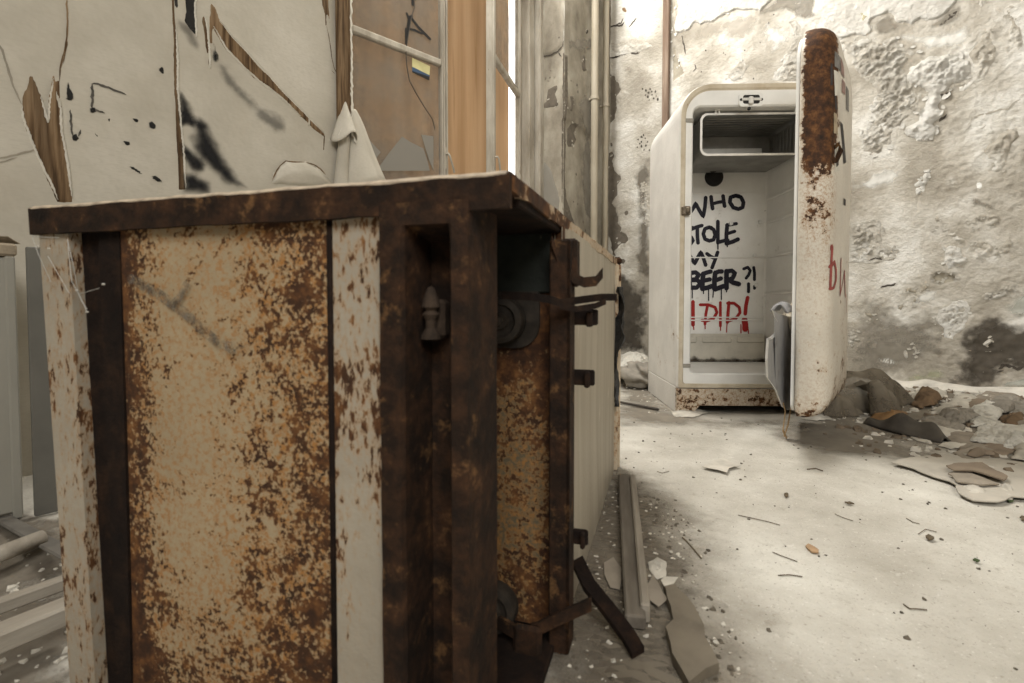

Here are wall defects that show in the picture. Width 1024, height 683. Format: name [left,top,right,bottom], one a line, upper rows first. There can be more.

leakage [621,275,646,350]
leakage [952,318,1024,387]